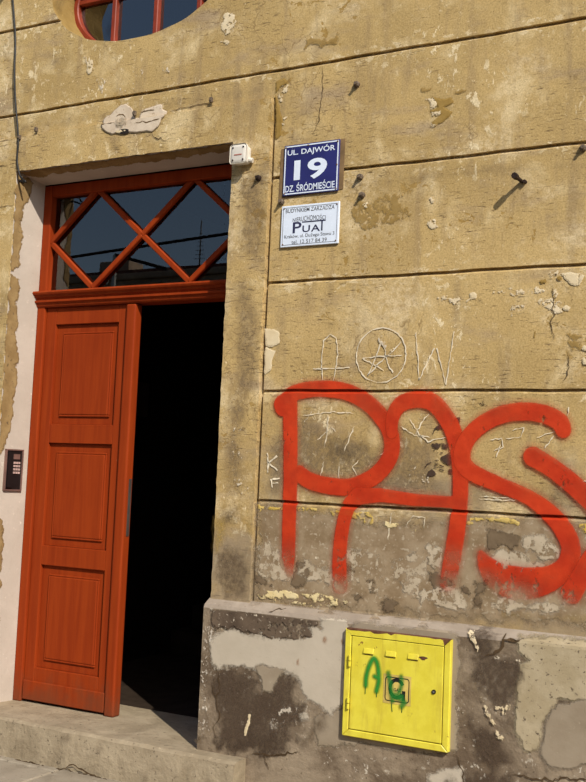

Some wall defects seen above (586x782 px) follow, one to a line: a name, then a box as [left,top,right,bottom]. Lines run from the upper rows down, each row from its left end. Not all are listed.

flaking render [101,103,167,135]
peeling [0,144,231,455]
peeling [567,333,586,364]
flaking render [254,502,586,629]
flaking render [514,634,586,753]